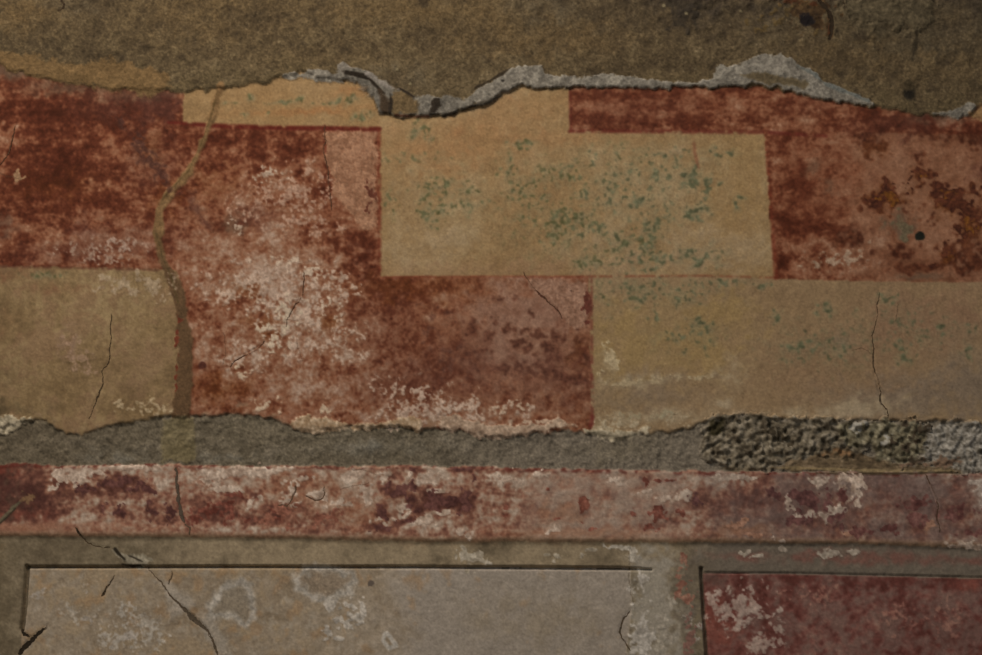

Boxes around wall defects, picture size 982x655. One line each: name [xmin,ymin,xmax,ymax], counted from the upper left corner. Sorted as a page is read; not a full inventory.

spalling [279,51,875,121]
leakage [223,155,352,243]
crack [151,80,226,535]
leakage [45,228,375,387]
crack [89,315,112,418]
crack [859,292,898,418]
spalling [0,413,44,437]
spalling [437,412,652,445]
leakage [74,472,345,533]
leakage [363,465,483,533]
peeling [485,467,551,491]
crack [148,567,218,654]